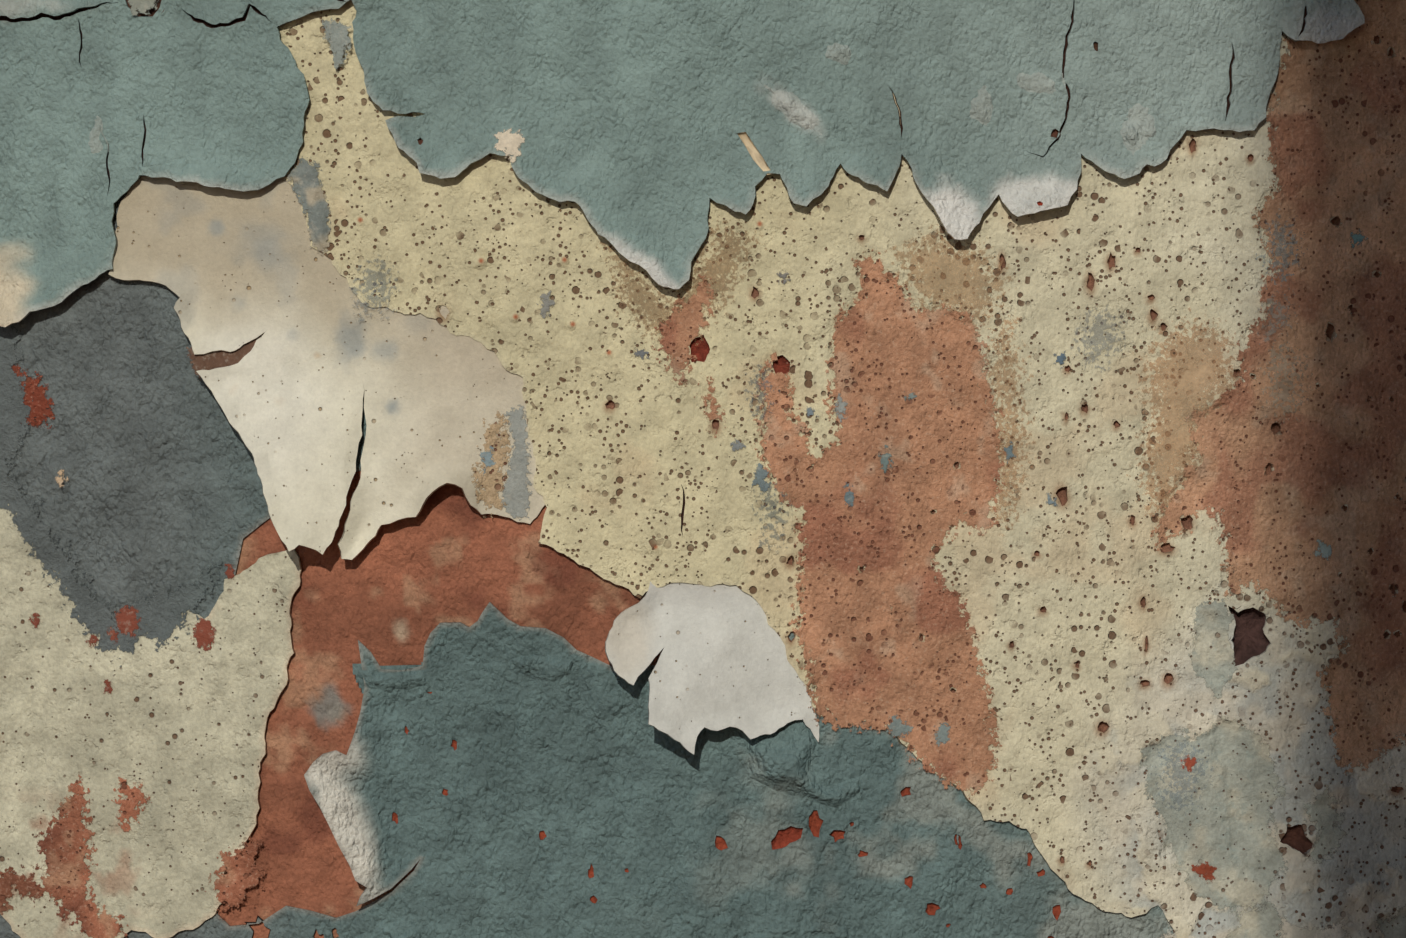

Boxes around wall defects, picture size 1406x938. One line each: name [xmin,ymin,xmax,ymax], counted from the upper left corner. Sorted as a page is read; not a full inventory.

crack [0,2,108,53]
peeling [126,0,164,17]
flaking render [0,30,1007,938]
peeling [220,0,1406,776]
peeling [1047,905,1061,938]
peeling [1140,716,1352,938]